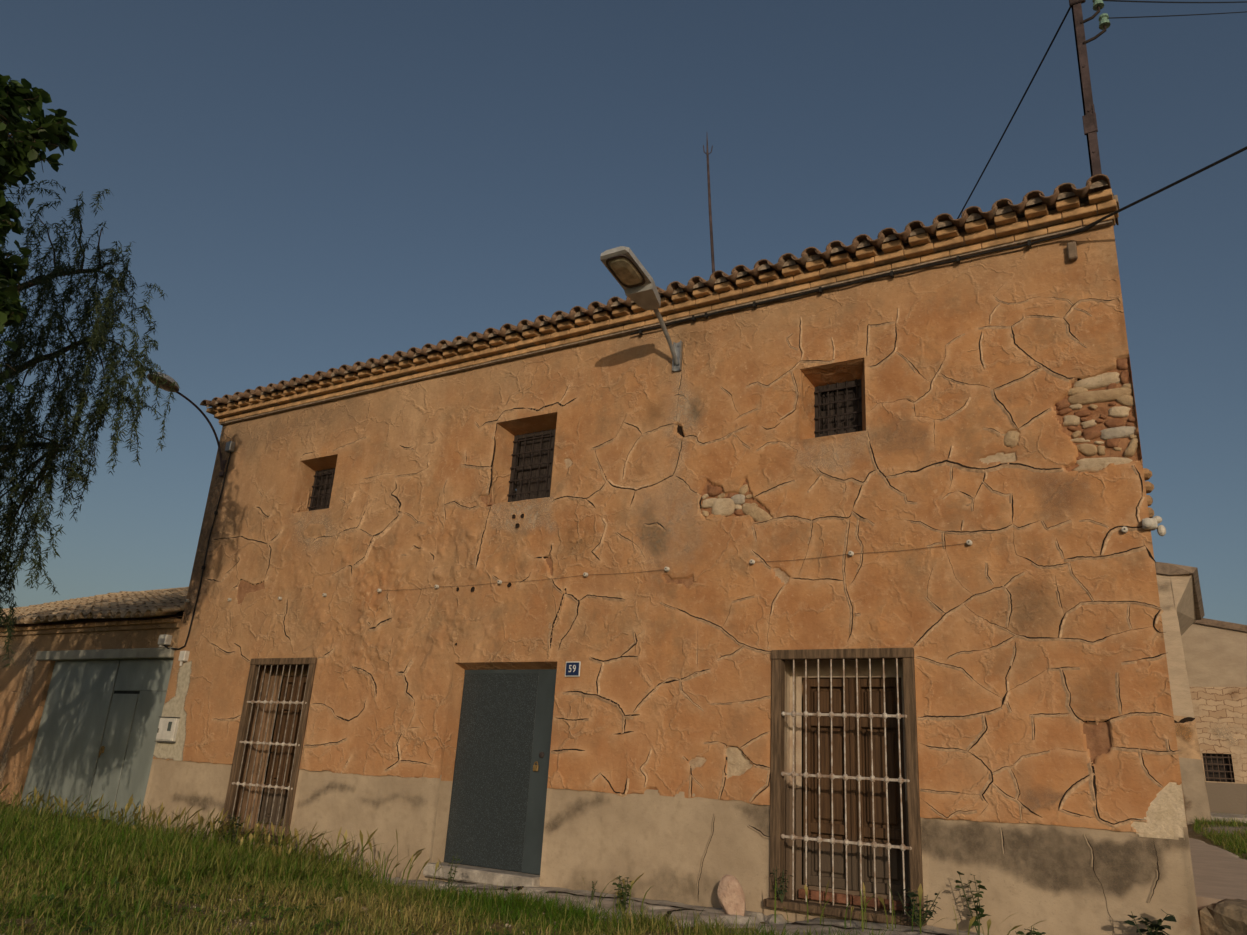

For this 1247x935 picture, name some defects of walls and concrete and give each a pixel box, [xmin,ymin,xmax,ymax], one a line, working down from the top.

spalling [1053,356,1143,473]
crack [211,643,250,663]
crack [205,489,291,641]
crack [304,648,434,772]
crack [311,384,625,650]
spalling [700,478,773,522]
crack [551,285,1196,930]
spalling [1083,722,1112,764]
crack [465,732,770,922]
water stain [1004,831,1155,893]
peeling [1131,782,1187,840]